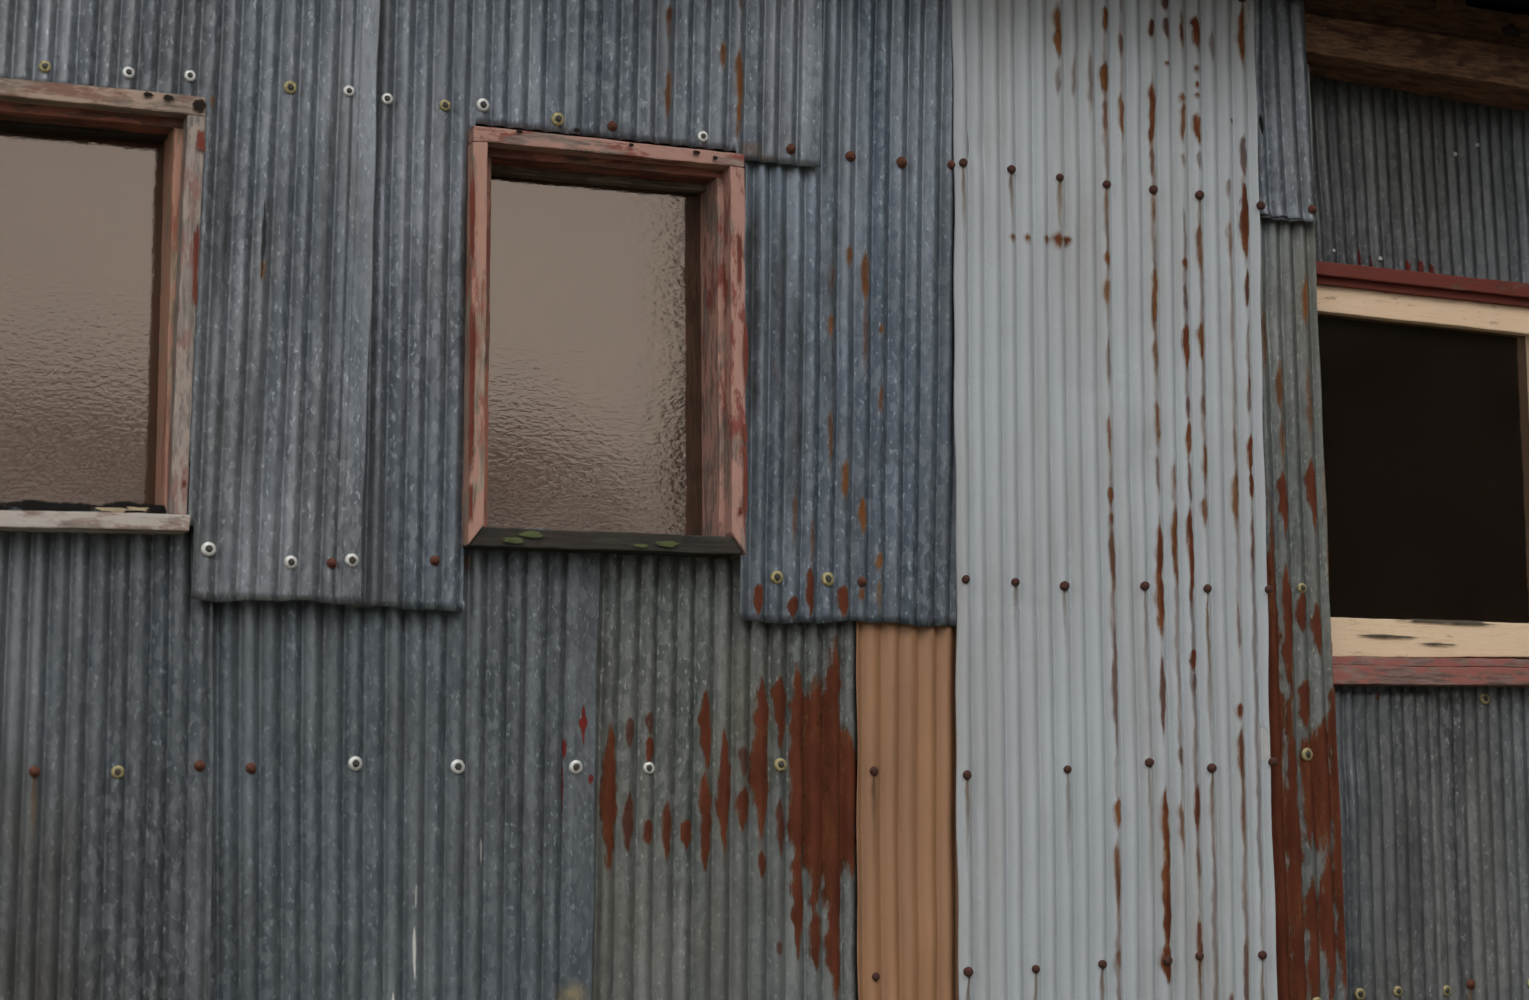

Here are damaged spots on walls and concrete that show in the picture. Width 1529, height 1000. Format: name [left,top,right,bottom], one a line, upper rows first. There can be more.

corrosion [1148,0,1200,47]
corrosion [1100,63,1124,133]
corrosion [1148,85,1156,143]
corrosion [1180,66,1201,143]
corrosion [1183,226,1202,270]
corrosion [1239,136,1249,307]
corrosion [1181,324,1204,367]
corrosion [1107,487,1115,586]
corrosion [1154,421,1210,671]
corrosion [1232,435,1347,1000]
corrosion [599,635,875,1000]
corrosion [1161,773,1214,984]